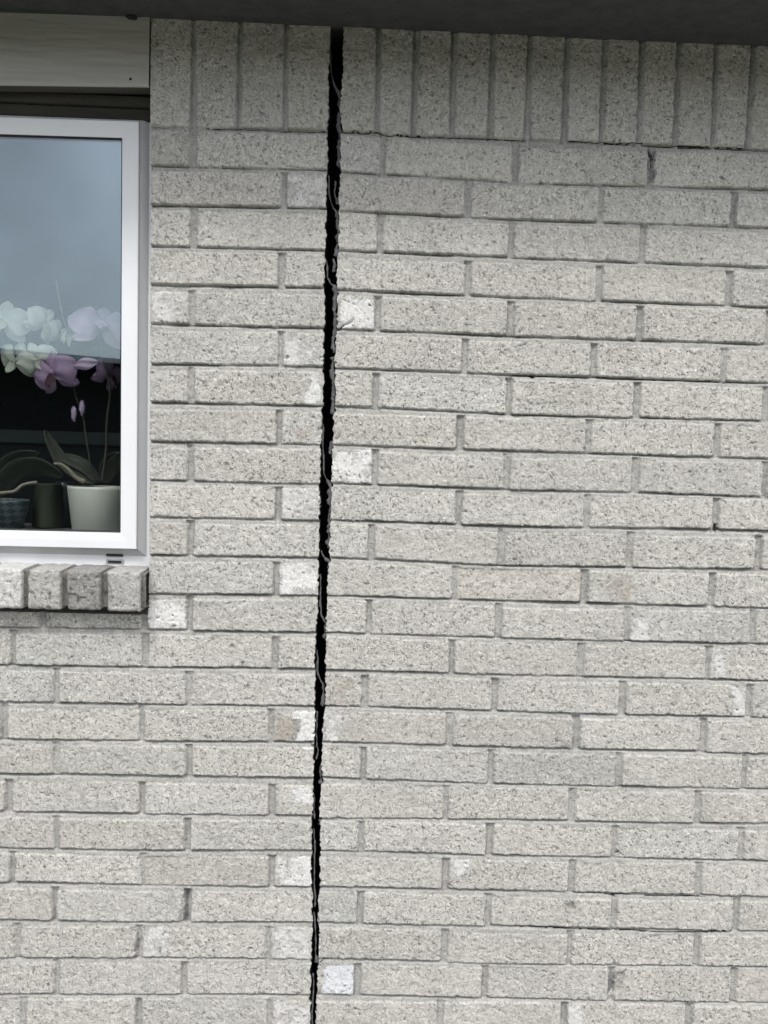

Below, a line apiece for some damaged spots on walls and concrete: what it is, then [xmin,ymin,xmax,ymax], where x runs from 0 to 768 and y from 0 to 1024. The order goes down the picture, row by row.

crack [206,30,524,1024]